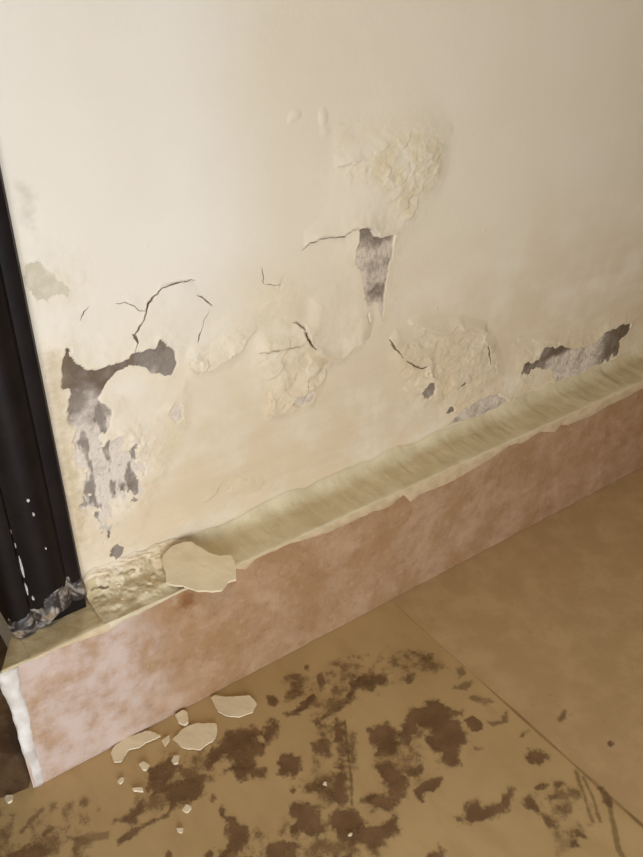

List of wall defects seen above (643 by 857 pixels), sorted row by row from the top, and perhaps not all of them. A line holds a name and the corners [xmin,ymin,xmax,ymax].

crack [116,279,212,353]
spalling [13,211,643,630]